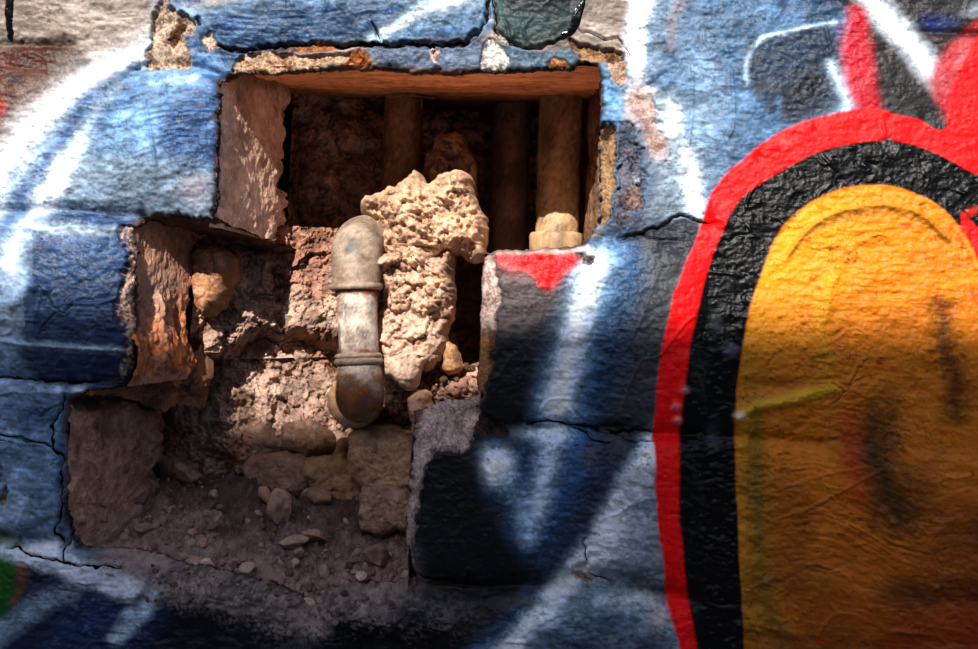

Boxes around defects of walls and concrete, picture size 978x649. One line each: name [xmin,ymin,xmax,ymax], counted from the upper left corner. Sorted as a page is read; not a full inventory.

crack [619,215,722,241]
peeling [575,252,598,266]
spalling [114,224,138,380]
rust [335,374,385,423]
spalling [406,253,510,571]
crack [0,376,124,570]
peeling [571,561,594,585]